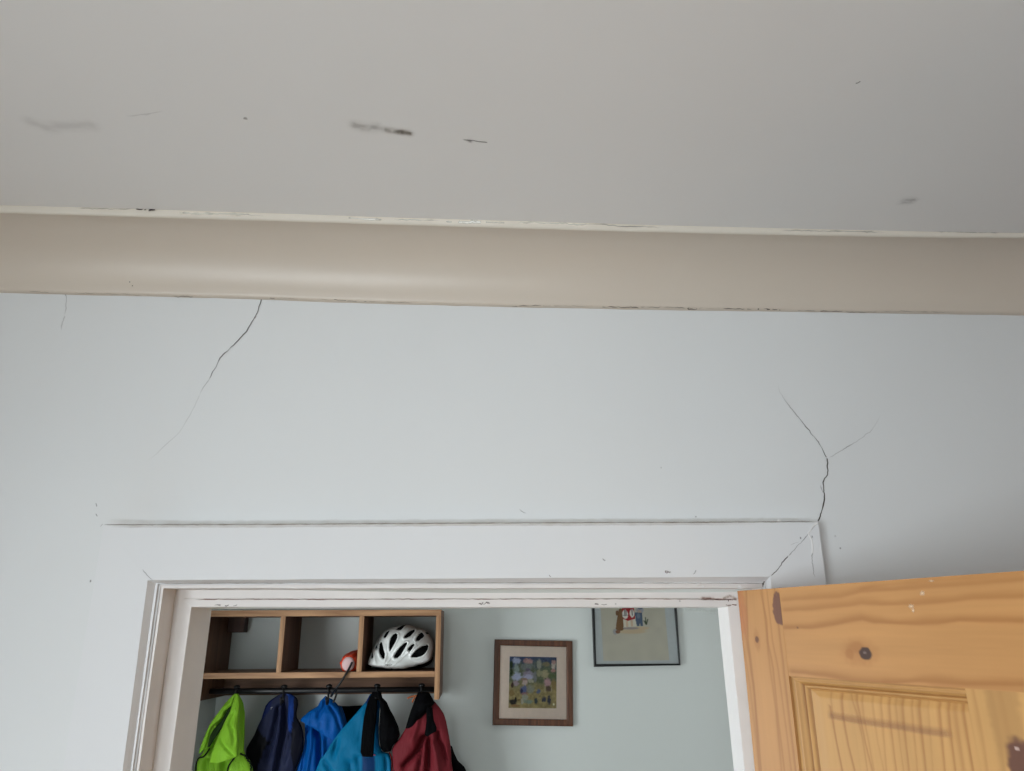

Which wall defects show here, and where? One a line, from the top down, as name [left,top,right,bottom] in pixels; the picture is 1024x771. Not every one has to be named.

crack [202,298,274,389]